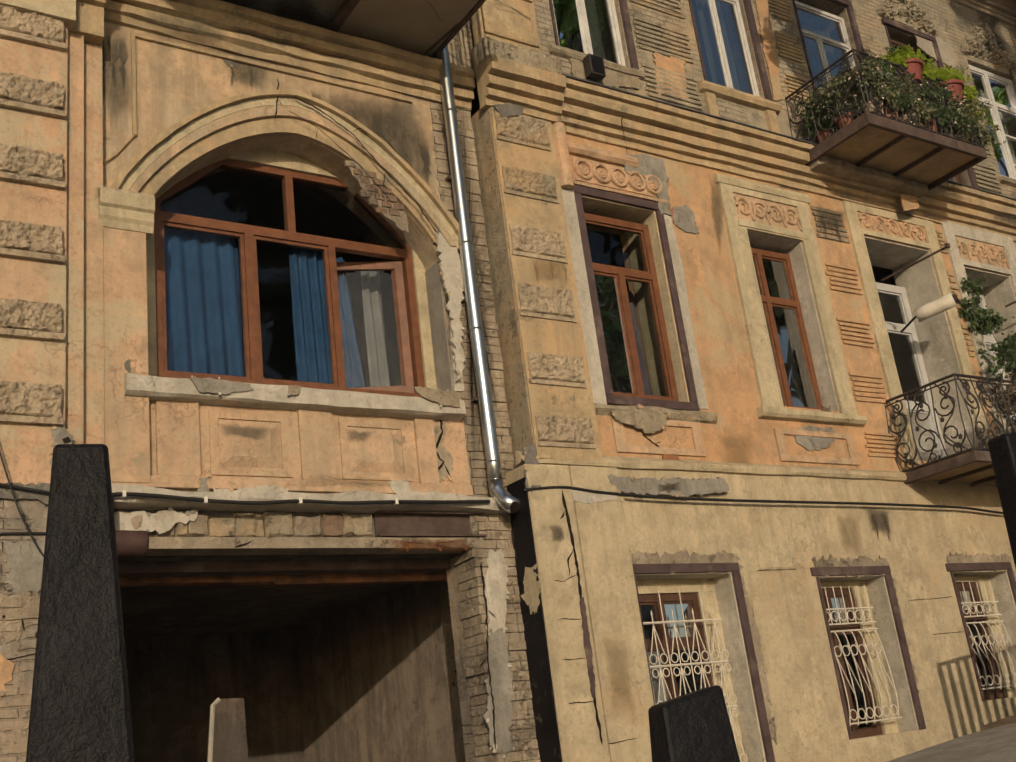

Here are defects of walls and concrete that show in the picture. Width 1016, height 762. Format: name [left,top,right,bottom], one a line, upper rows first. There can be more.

leakage [102,49,126,105]
crack [275,77,439,235]
flaking render [344,160,409,233]
spalling [623,153,677,225]
spalling [413,228,467,408]
spalling [388,420,454,495]
crack [436,420,453,481]
flaking render [114,507,373,537]
crack [554,490,582,620]
flaking render [0,591,40,699]
peeling [483,532,541,758]
crack [569,697,636,744]